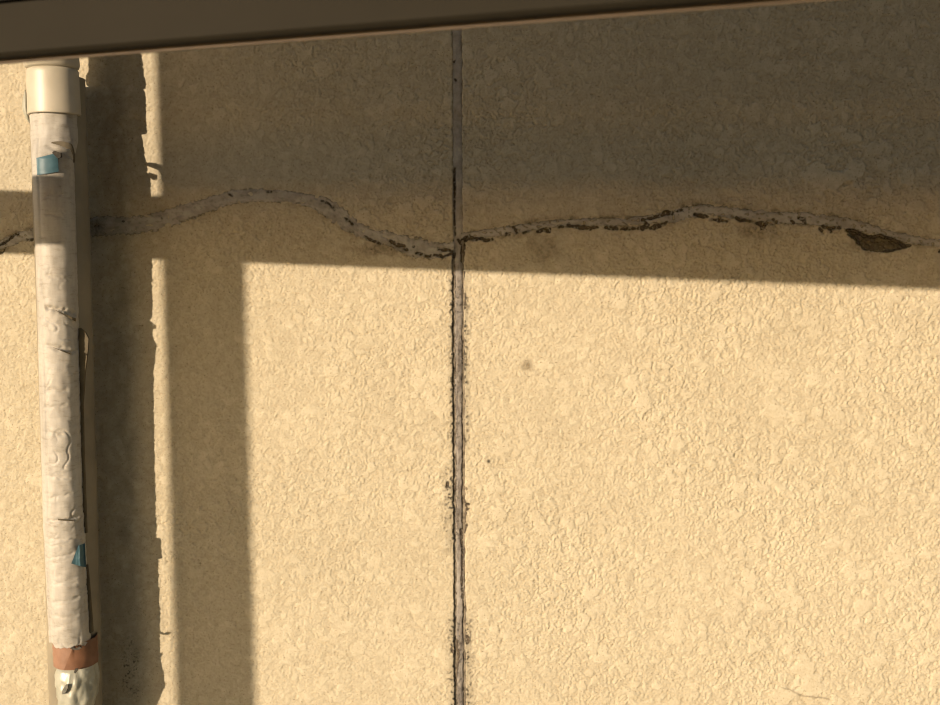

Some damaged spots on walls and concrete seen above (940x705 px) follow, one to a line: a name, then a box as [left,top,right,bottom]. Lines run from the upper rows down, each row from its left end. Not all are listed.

crack [90,188,940,260]
crack [0,228,34,254]
spalling [846,229,907,253]